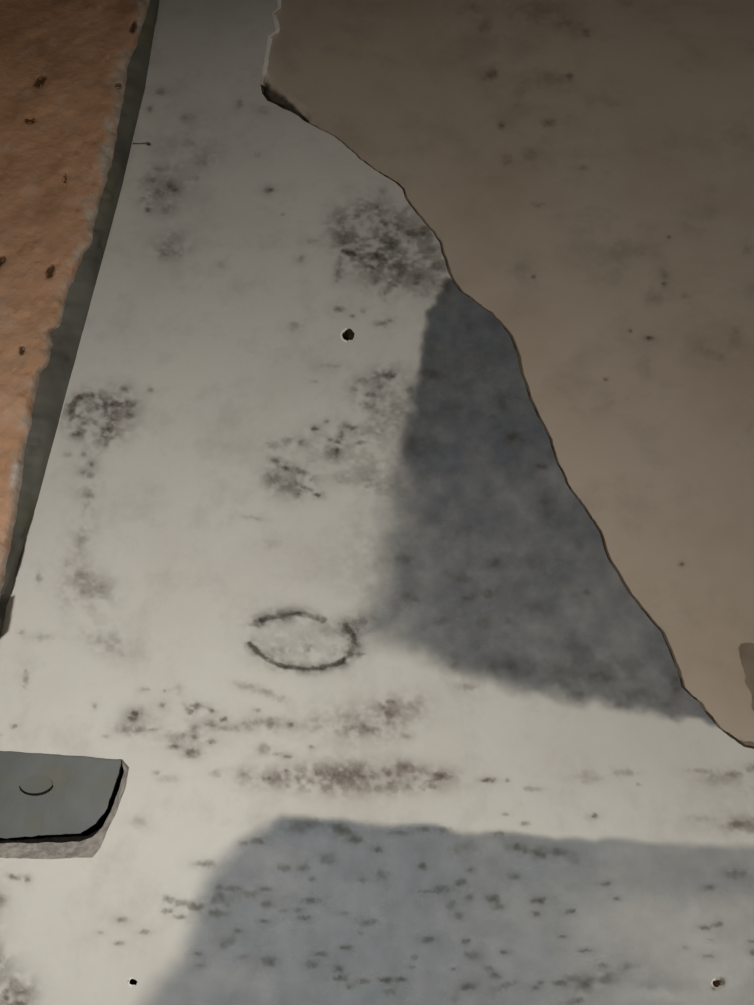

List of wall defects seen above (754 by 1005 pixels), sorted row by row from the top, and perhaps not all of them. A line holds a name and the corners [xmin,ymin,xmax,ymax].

damp [248,643,345,670]
flaking render [260,0,754,749]